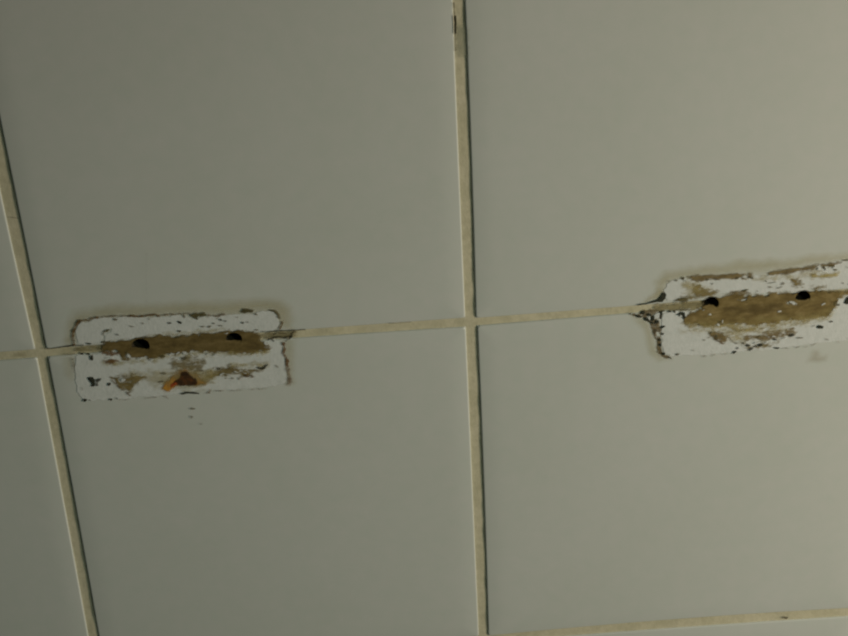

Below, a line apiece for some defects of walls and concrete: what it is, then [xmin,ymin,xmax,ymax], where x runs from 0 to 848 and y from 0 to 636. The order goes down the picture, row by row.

peeling [633,259,848,359]
peeling [74,311,287,401]
rust [163,369,207,391]